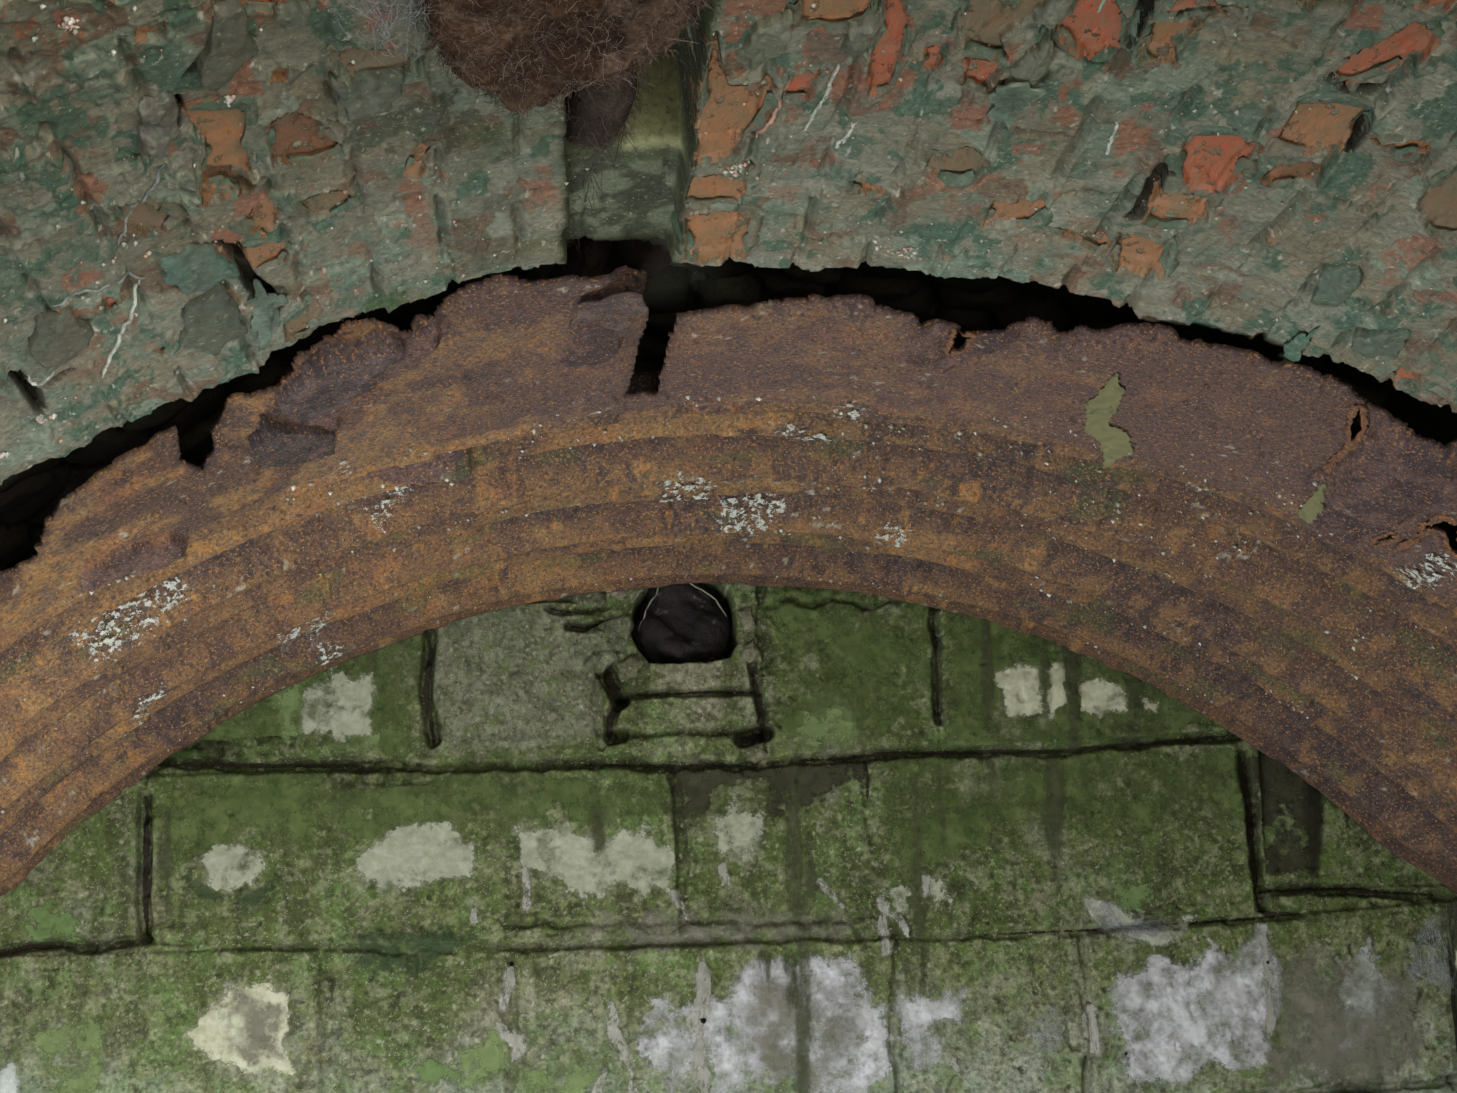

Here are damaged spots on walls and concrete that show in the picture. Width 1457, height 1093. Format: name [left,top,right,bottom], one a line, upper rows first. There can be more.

flaking render [785,0,944,99]
flaking render [107,95,365,276]
flaking render [671,14,819,264]
flaking render [976,0,1457,279]
crack [228,241,275,293]
crack [11,370,39,406]
crack [423,630,436,743]
damp [355,821,475,893]
damp [514,757,966,1093]
damp [0,1062,20,1093]
damp [187,978,296,1076]
damp [1081,896,1424,1086]